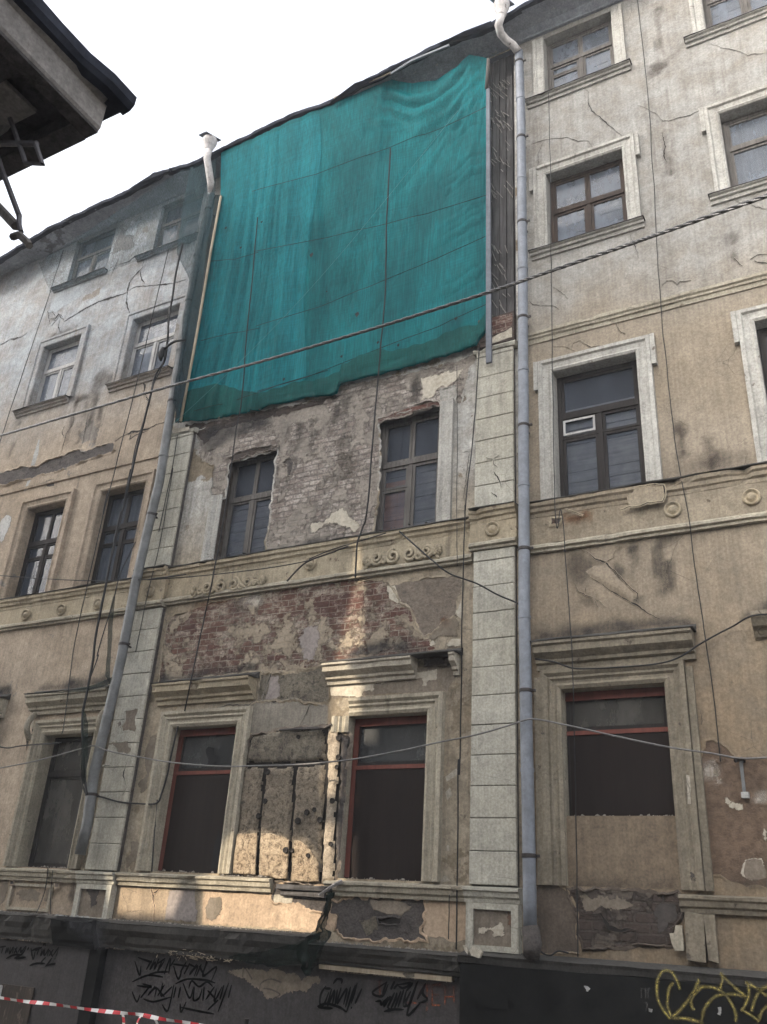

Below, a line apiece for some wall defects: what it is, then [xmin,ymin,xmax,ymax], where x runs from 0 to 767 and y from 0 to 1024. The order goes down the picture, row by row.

crack [532,88,623,166]
crack [637,102,716,167]
crack [0,257,186,346]
flaking render [172,352,477,550]
crack [573,548,660,620]
flaking render [158,575,465,944]
peeling [725,797,743,811]
flaking render [540,885,684,956]